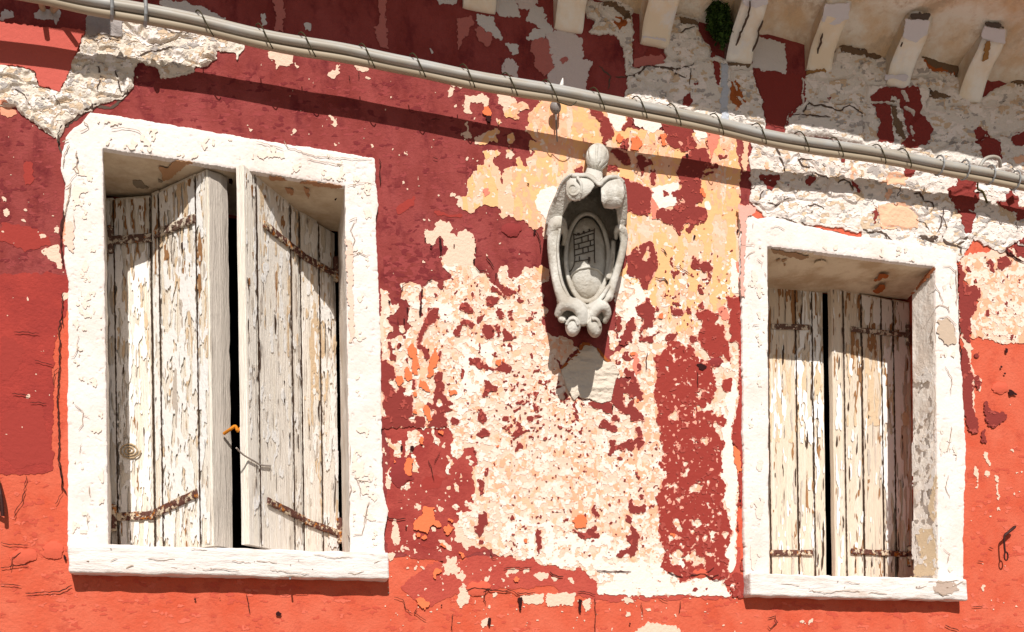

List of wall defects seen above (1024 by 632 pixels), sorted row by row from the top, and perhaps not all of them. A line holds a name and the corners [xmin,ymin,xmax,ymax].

flaking render [0,15,245,138]
flaking render [585,0,766,129]
crack [776,148,854,190]
crack [793,102,863,117]
flaking render [784,47,1024,175]
crack [12,293,90,528]
peeling [352,85,1024,632]